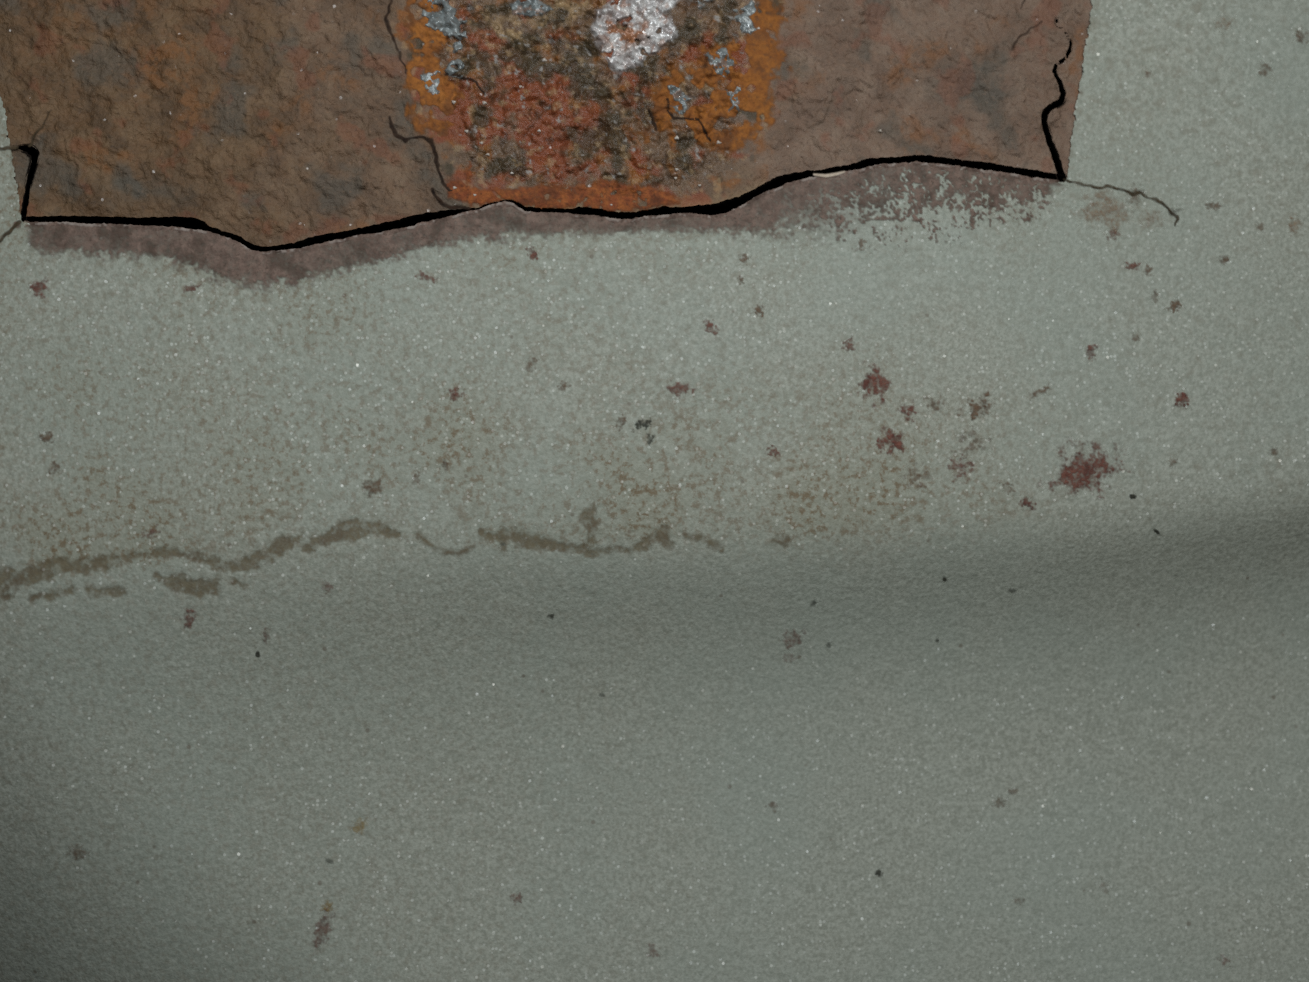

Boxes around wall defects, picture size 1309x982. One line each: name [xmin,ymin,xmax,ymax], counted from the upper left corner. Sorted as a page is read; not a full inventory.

rust [0,0,1093,288]
crack [0,0,1179,250]
rust [861,368,889,406]
rust [958,392,989,420]
rust [877,427,904,453]
rust [1050,443,1117,498]